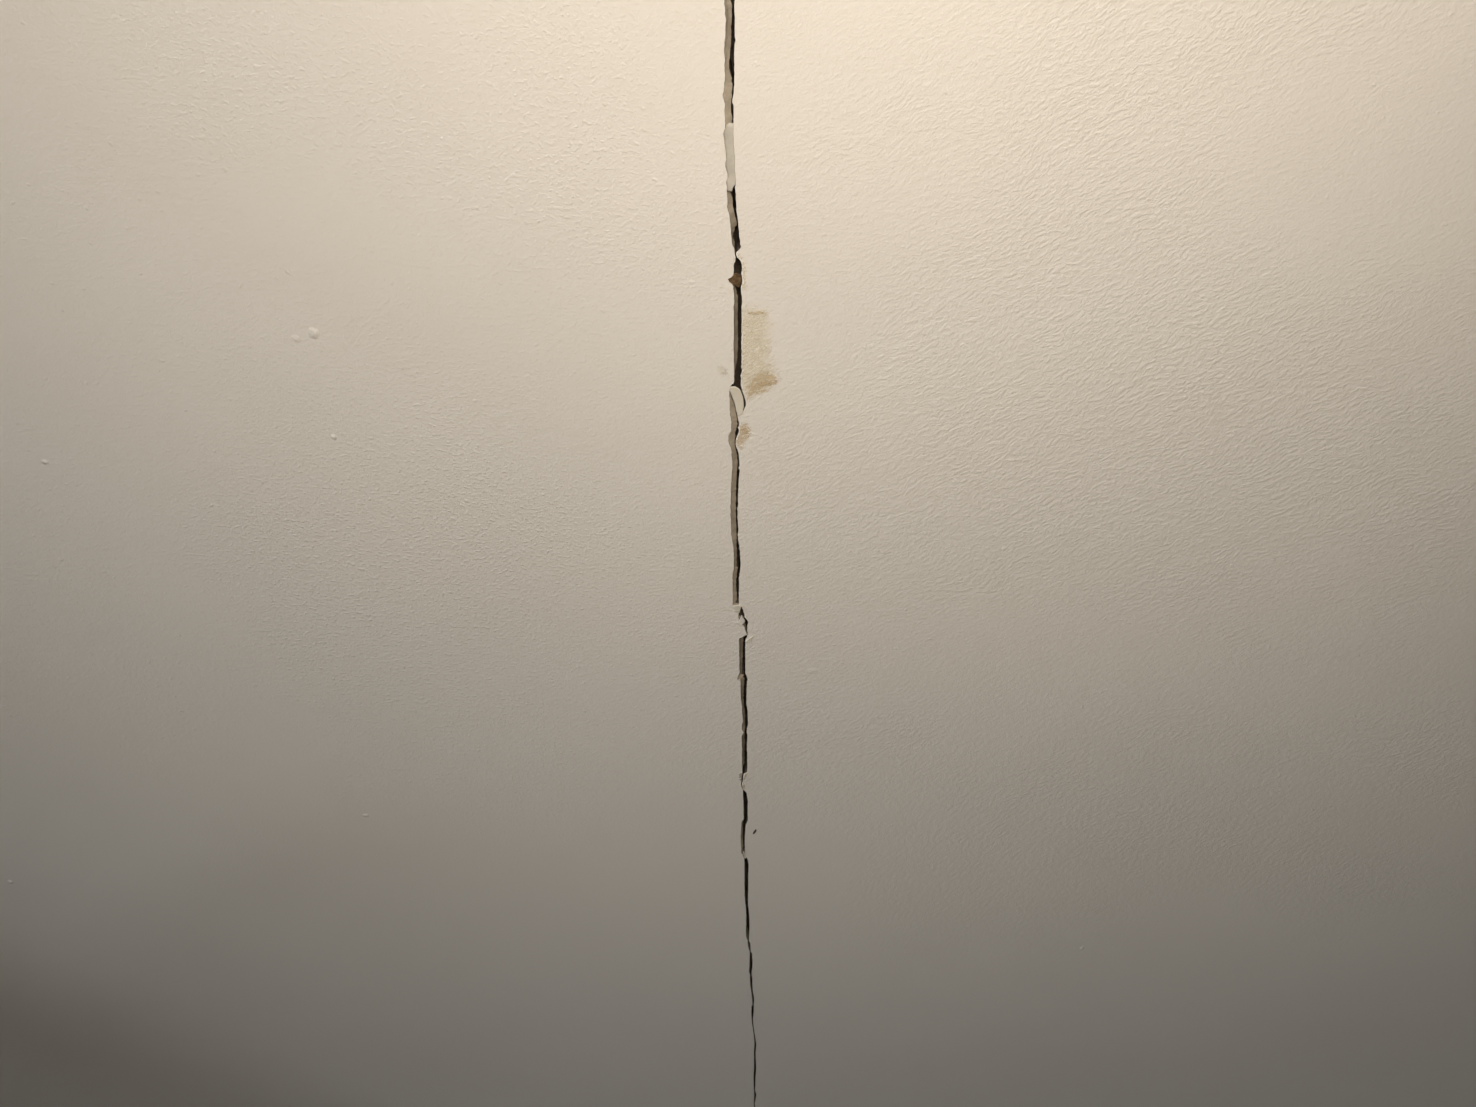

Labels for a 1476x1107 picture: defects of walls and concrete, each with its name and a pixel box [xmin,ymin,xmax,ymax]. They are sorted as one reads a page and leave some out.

crack [723,0,756,1107]